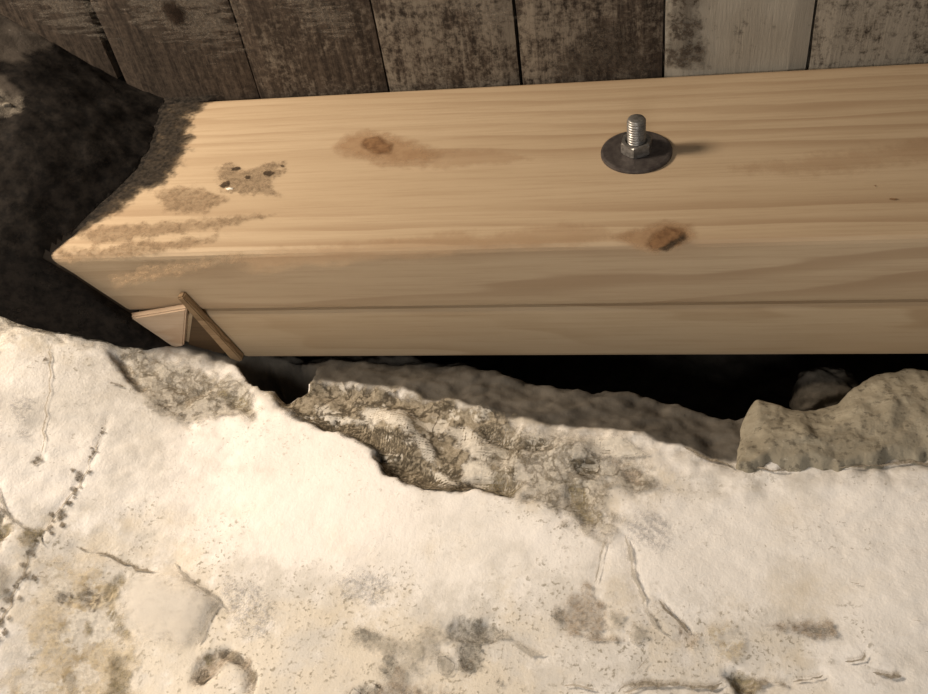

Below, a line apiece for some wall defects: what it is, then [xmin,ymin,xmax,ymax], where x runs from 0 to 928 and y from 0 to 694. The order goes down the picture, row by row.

damp [663,0,705,68]
spalling [268,381,656,545]
crack [0,420,107,636]
crack [77,547,237,644]
crack [595,536,688,636]
damp [349,617,545,694]